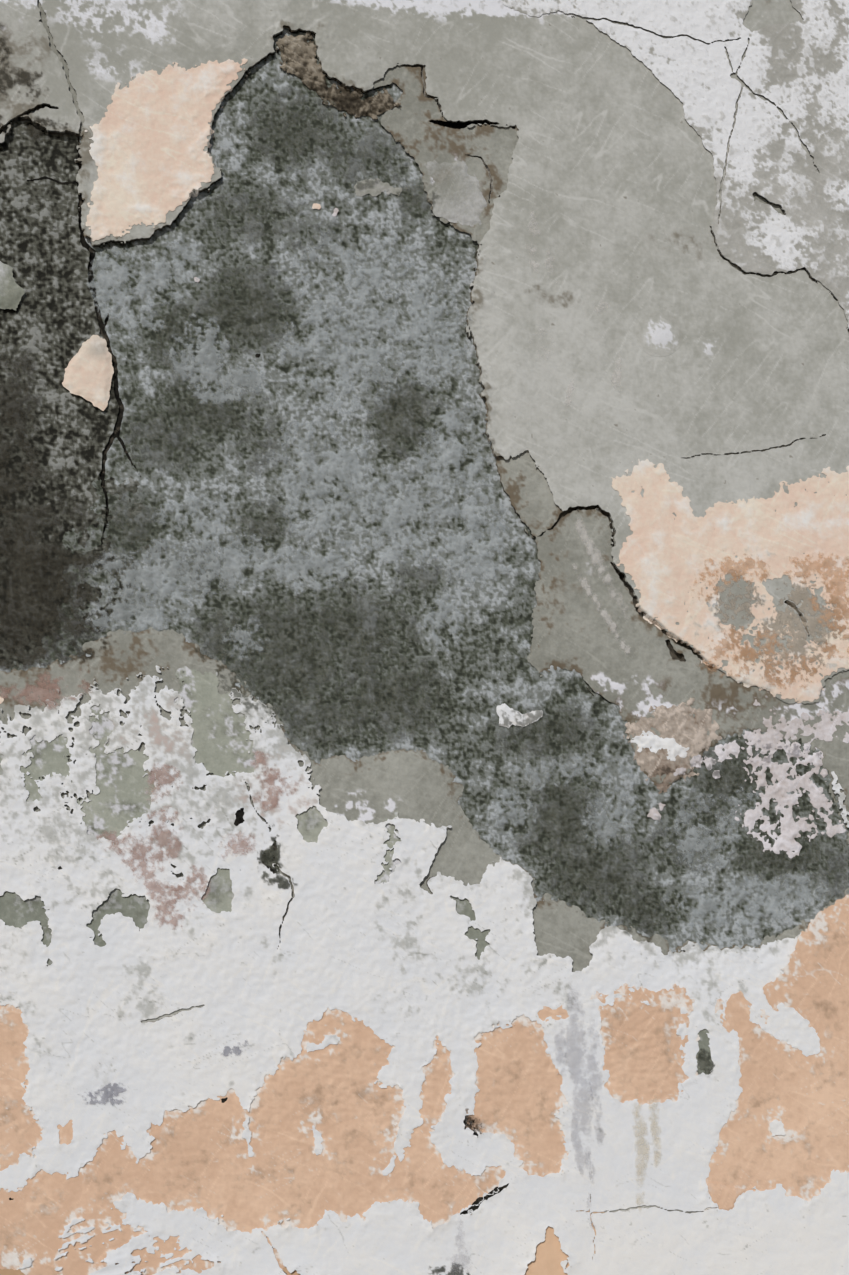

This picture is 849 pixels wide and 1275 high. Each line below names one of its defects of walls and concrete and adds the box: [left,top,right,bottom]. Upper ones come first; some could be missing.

crack [210,29,316,141]
crack [564,13,819,171]
crack [2,0,221,546]
water stain [88,242,200,337]
water stain [281,233,467,411]
crack [710,226,837,301]
water stain [0,355,508,707]
spalling [0,28,849,960]
water stain [228,835,296,889]
peeling [589,983,715,1106]
peeling [706,895,849,1201]
peeling [0,1004,569,1275]